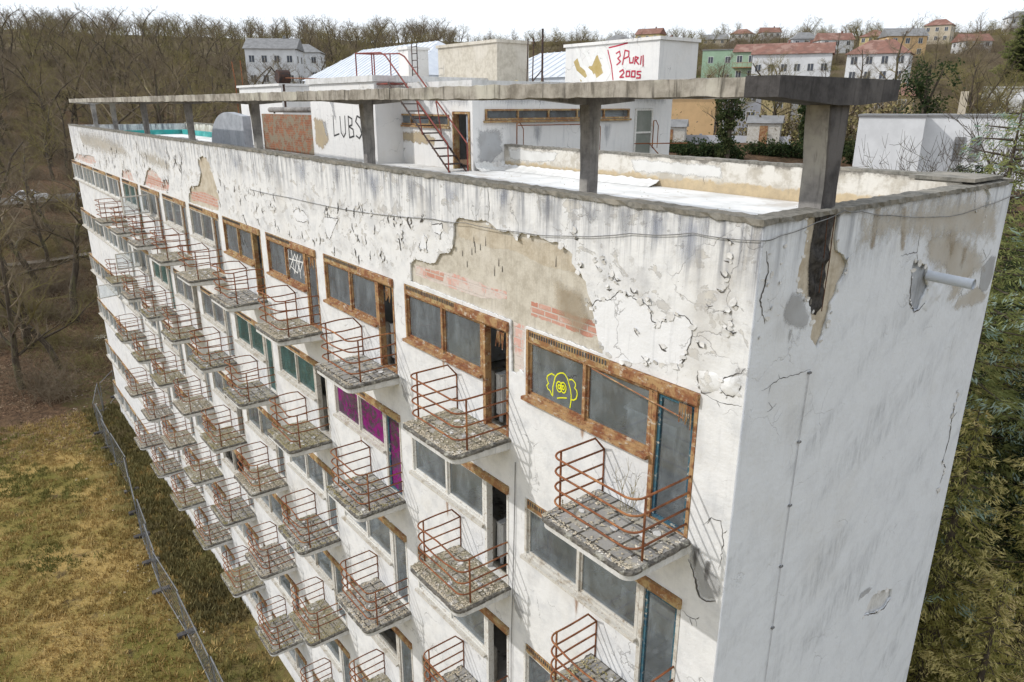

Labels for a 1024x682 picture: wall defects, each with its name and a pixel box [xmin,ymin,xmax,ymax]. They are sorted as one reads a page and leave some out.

spalling [76,133,182,193]
spalling [188,157,387,263]
spalling [387,212,704,372]
peeling [717,236,739,337]
peeling [759,251,783,322]
spalling [909,259,942,312]
crack [936,390,960,494]
spalling [863,588,891,619]